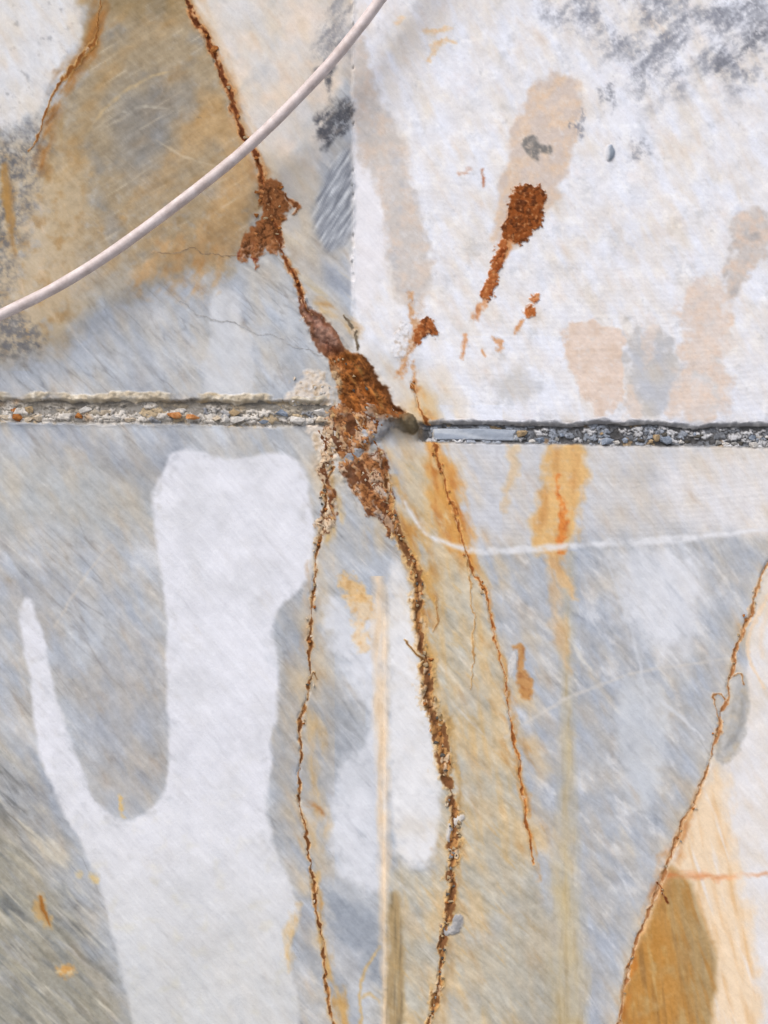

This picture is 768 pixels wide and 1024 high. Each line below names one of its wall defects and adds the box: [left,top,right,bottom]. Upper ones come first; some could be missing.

crack [27,0,112,179]
water stain [0,0,261,371]
crack [179,0,366,357]
rust [390,288,440,393]
rust [458,182,548,361]
crack [279,465,353,1024]
crack [373,381,768,1024]
water stain [617,757,768,1024]